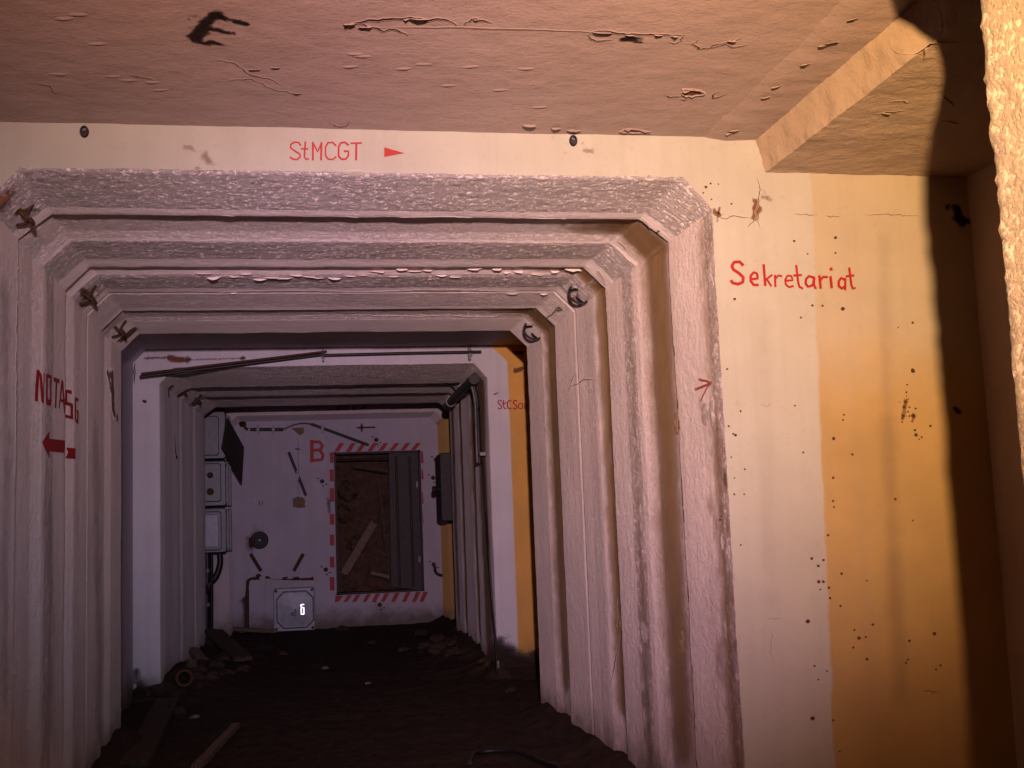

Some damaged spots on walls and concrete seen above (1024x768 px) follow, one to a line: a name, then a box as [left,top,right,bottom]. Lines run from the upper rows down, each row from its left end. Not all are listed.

crack [216,58,301,95]
spalling [666,88,706,101]
crack [747,177,762,229]
peeling [195,268,581,281]